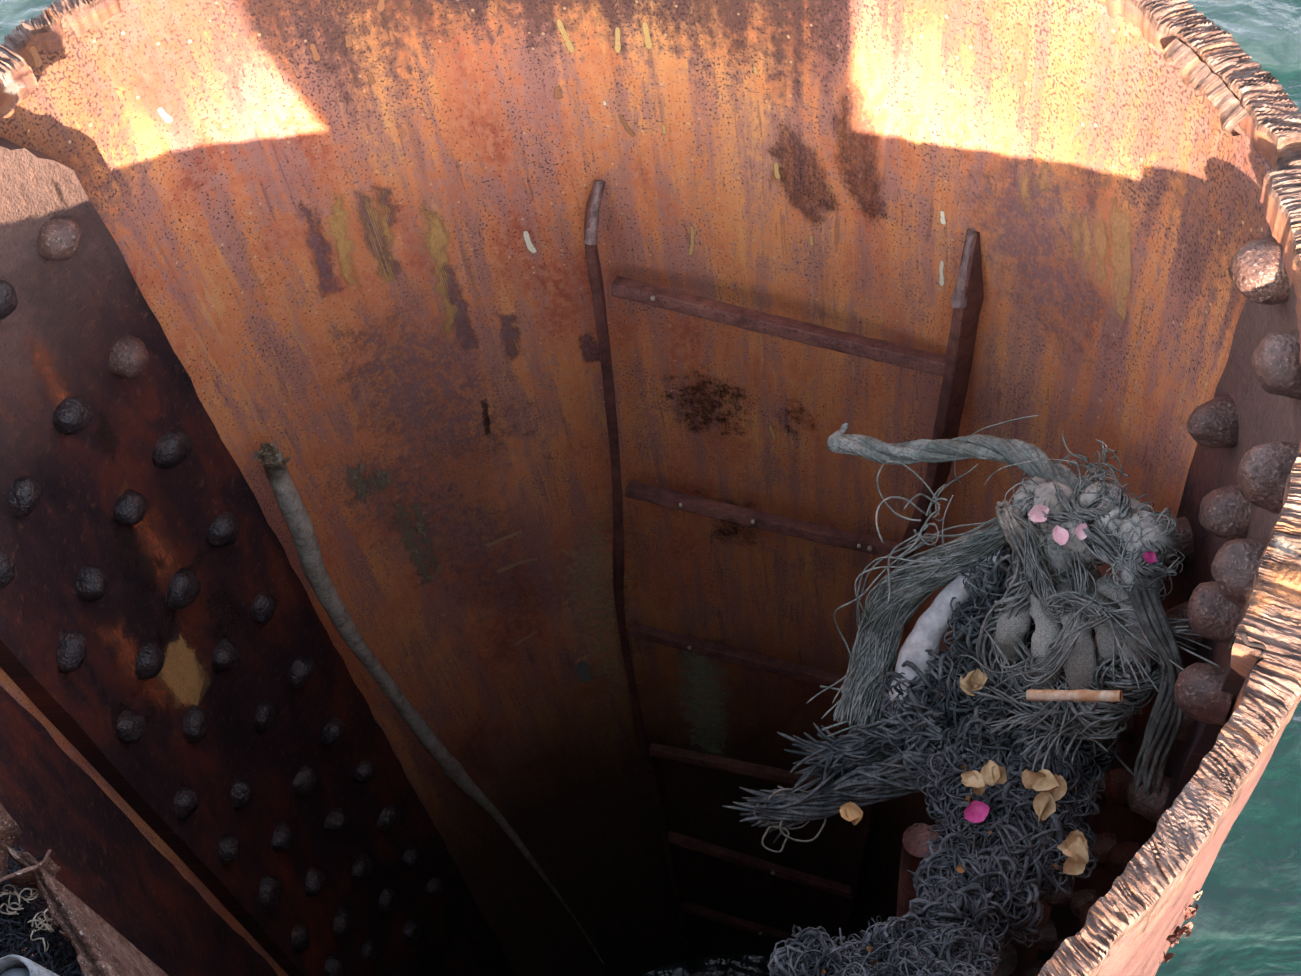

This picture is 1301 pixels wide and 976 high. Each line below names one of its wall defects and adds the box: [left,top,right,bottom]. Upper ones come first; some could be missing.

water stain [557,19,574,53]
water stain [642,22,653,49]
rust [1163,38,1249,136]
rust [769,126,836,222]
rust [835,89,885,218]
rust [300,206,341,295]
rust [355,188,400,275]
rust [974,166,1106,351]
rust [440,265,478,350]
rust [481,400,491,435]
rust [666,372,742,435]
rust [99,624,204,706]